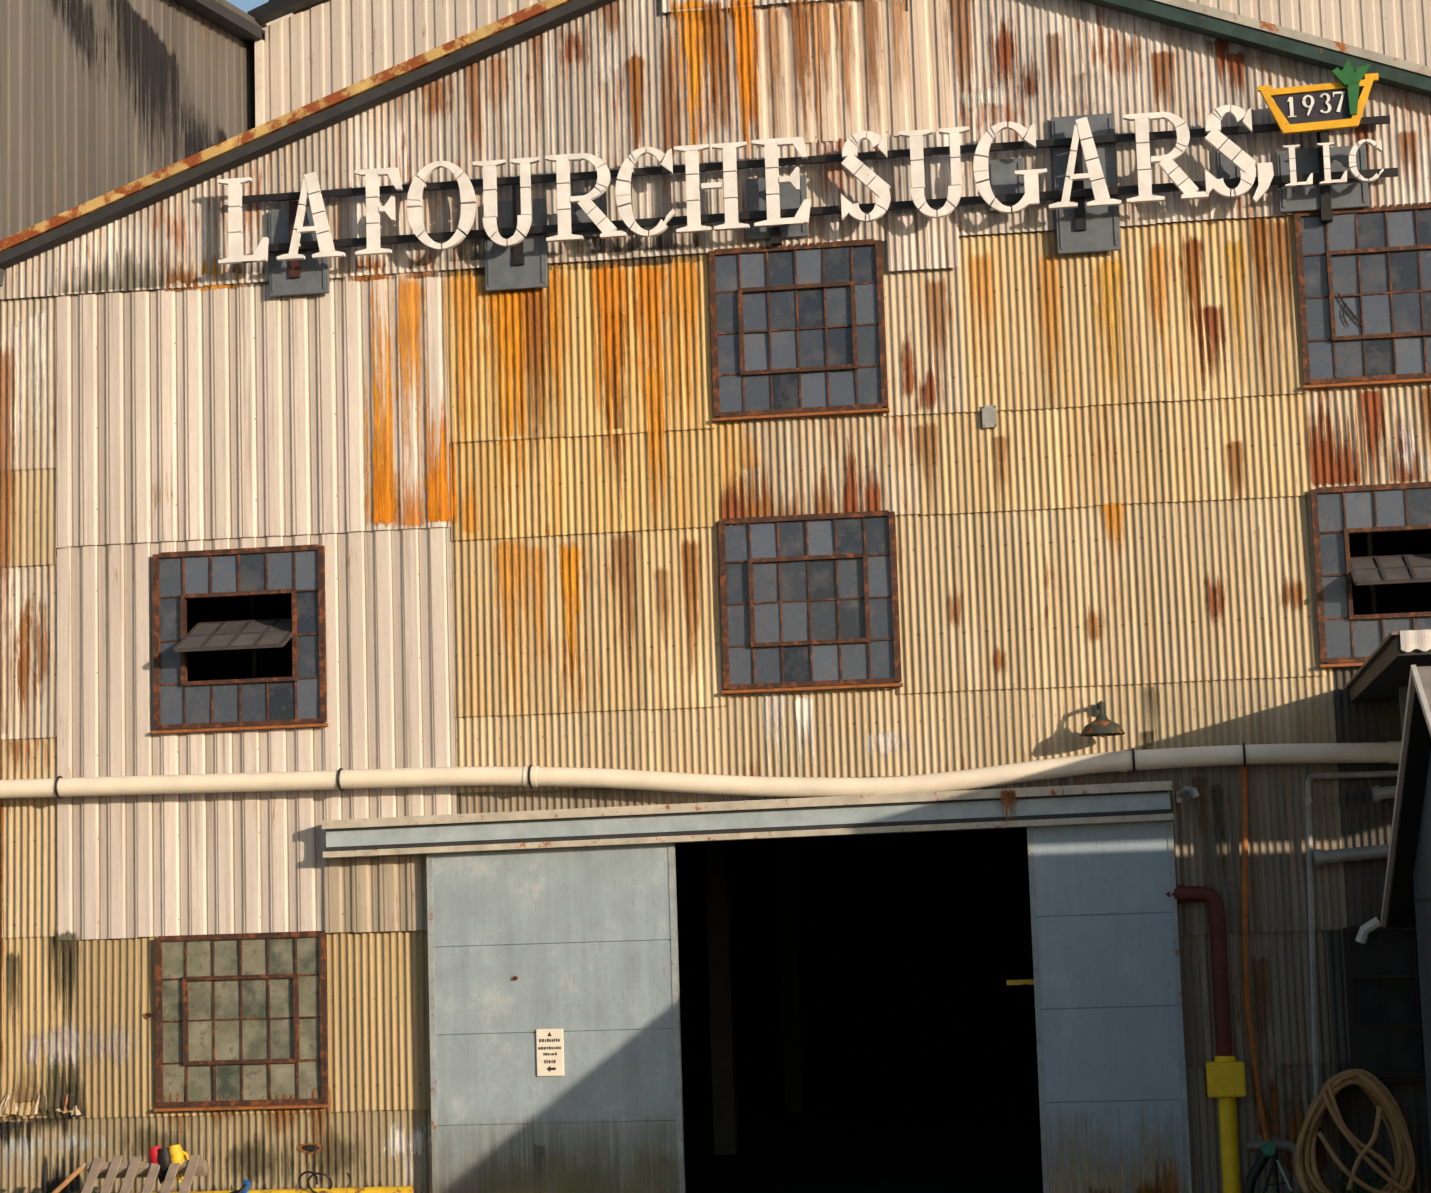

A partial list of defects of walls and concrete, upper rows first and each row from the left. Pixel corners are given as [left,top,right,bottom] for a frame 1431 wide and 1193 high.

corrosion [623,55,645,150]
corrosion [661,0,907,155]
corrosion [945,0,1038,114]
corrosion [1123,33,1176,112]
corrosion [348,254,555,527]
corrosion [592,260,699,499]
corrosion [1092,258,1125,398]
corrosion [1307,390,1420,486]
corrosion [0,347,49,712]
water stain [7,952,20,1024]
water stain [48,932,77,1028]
water stain [0,1053,86,1193]